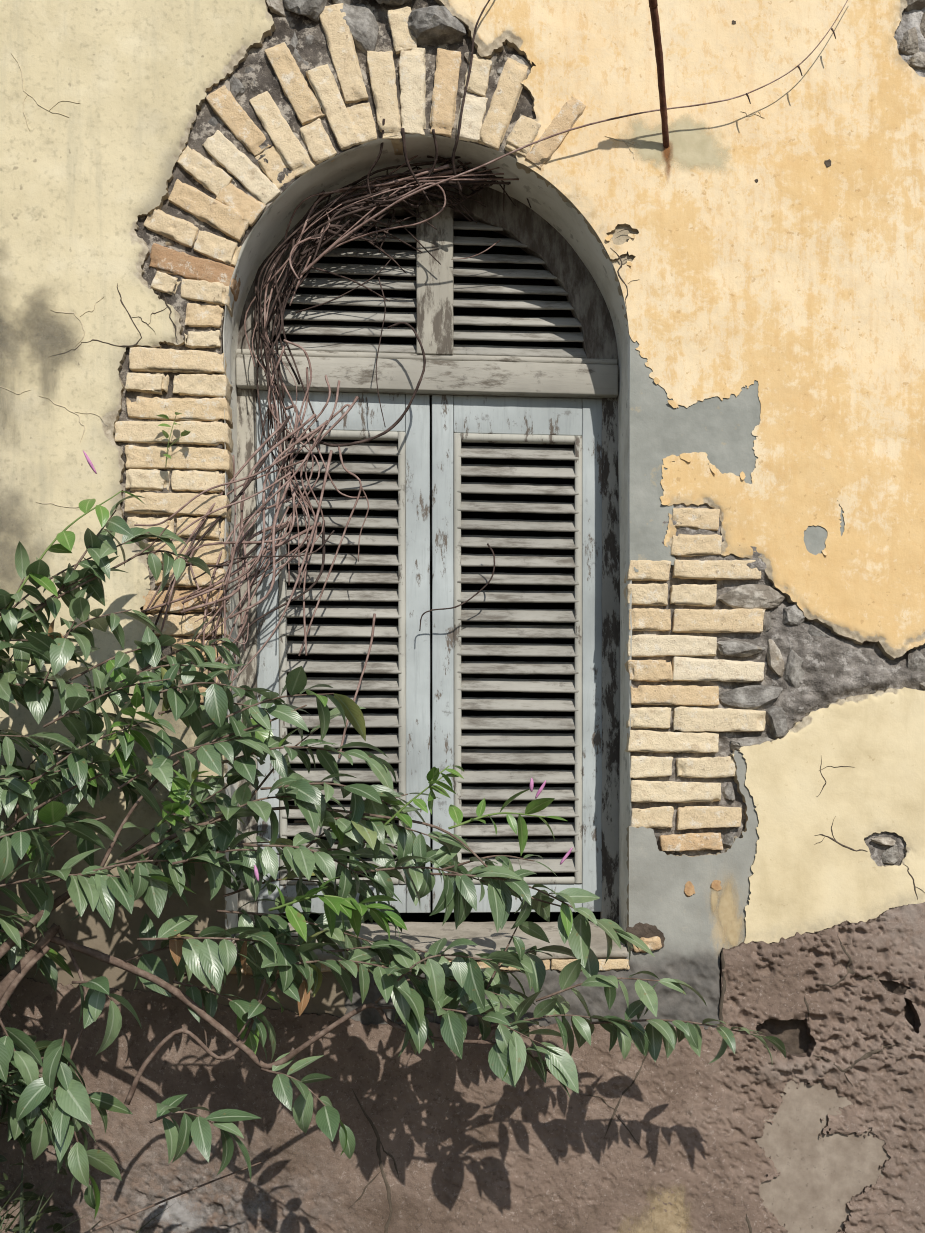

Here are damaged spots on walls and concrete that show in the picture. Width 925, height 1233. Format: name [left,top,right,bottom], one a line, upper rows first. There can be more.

flaking render [894,0,925,77]
crack [15,59,80,126]
peeling [605,225,639,266]
crack [50,283,178,357]
flaking render [114,0,586,708]
flaking render [623,337,925,856]
crack [814,759,866,851]
spalling [684,881,695,897]
flaking render [864,831,907,866]
crack [907,866,925,900]
spalling [626,922,665,953]
flaking render [756,1078,890,1233]